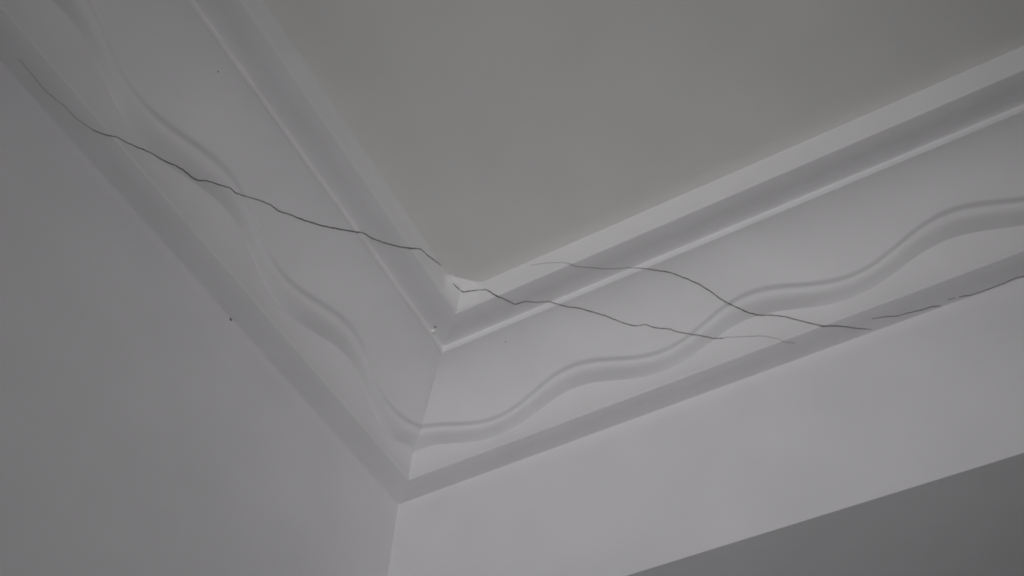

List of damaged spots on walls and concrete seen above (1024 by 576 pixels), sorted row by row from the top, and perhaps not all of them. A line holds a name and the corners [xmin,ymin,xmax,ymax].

crack [19,59,1024,343]